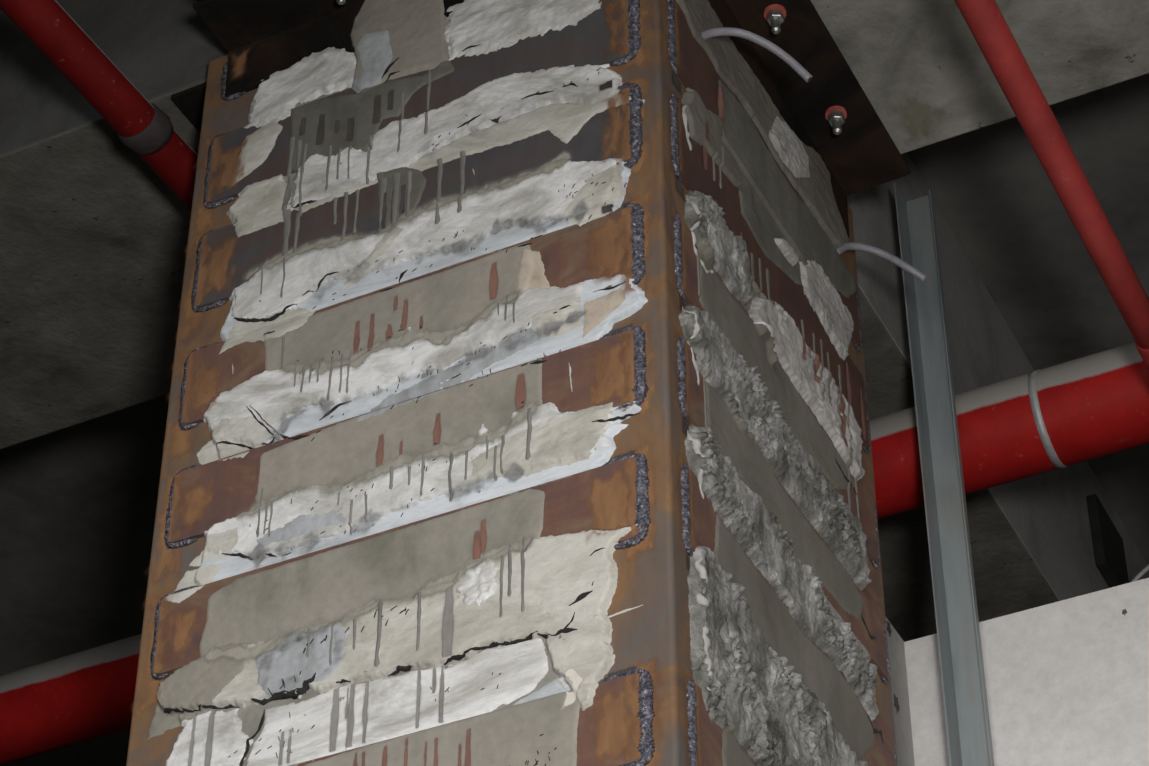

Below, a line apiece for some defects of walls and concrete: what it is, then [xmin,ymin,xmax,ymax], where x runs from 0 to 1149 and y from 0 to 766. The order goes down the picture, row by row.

rust [184,138,246,333]
water stain [280,0,454,298]
water stain [199,359,583,766]
peeling [147,524,638,766]
crack [216,305,570,449]
peeling [165,401,641,603]
water stain [264,243,550,401]
peeling [219,47,645,354]
crack [388,548,605,701]
crack [592,413,640,422]
rust [590,194,650,292]
rust [590,446,655,559]